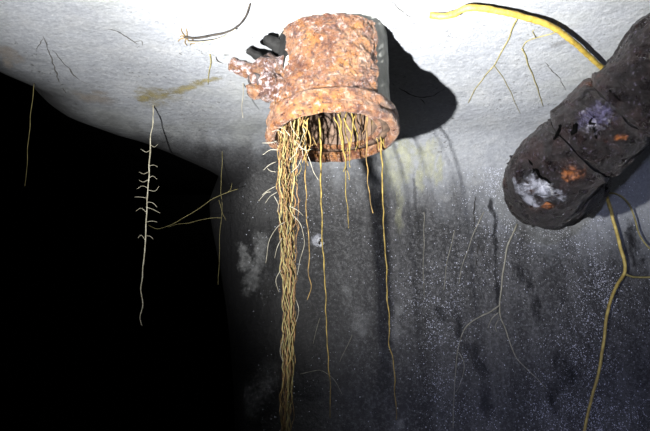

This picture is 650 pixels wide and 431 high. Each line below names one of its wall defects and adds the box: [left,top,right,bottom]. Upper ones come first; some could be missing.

crack [36,37,93,93]
leakage [487,199,498,258]
leakage [625,225,644,265]